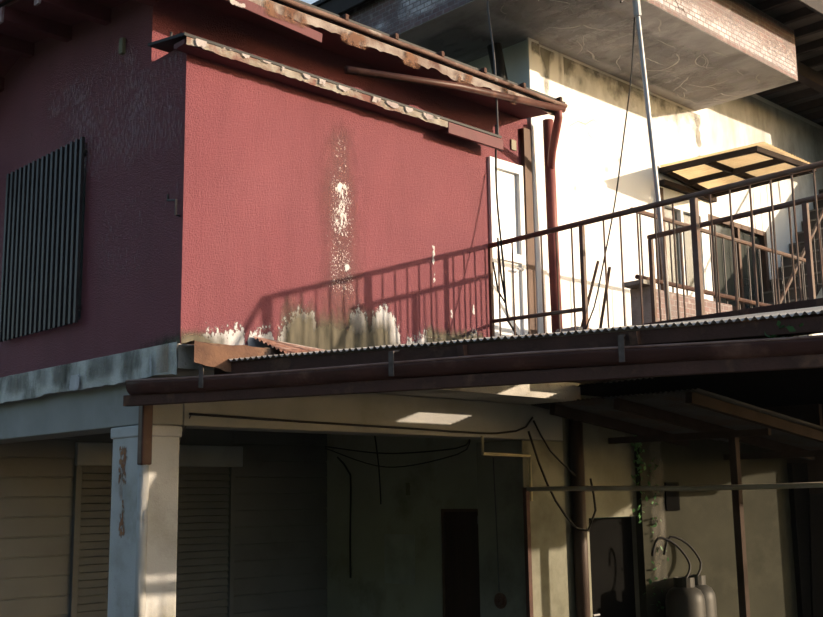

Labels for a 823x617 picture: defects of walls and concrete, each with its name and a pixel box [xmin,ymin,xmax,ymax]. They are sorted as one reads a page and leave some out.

corrosion [342,32,366,49]
corrosion [403,51,418,68]
water stain [422,28,494,58]
water stain [498,0,743,147]
water stain [656,0,795,81]
peeling [329,136,440,345]
peeling [204,307,315,348]
corrosion [118,447,127,486]